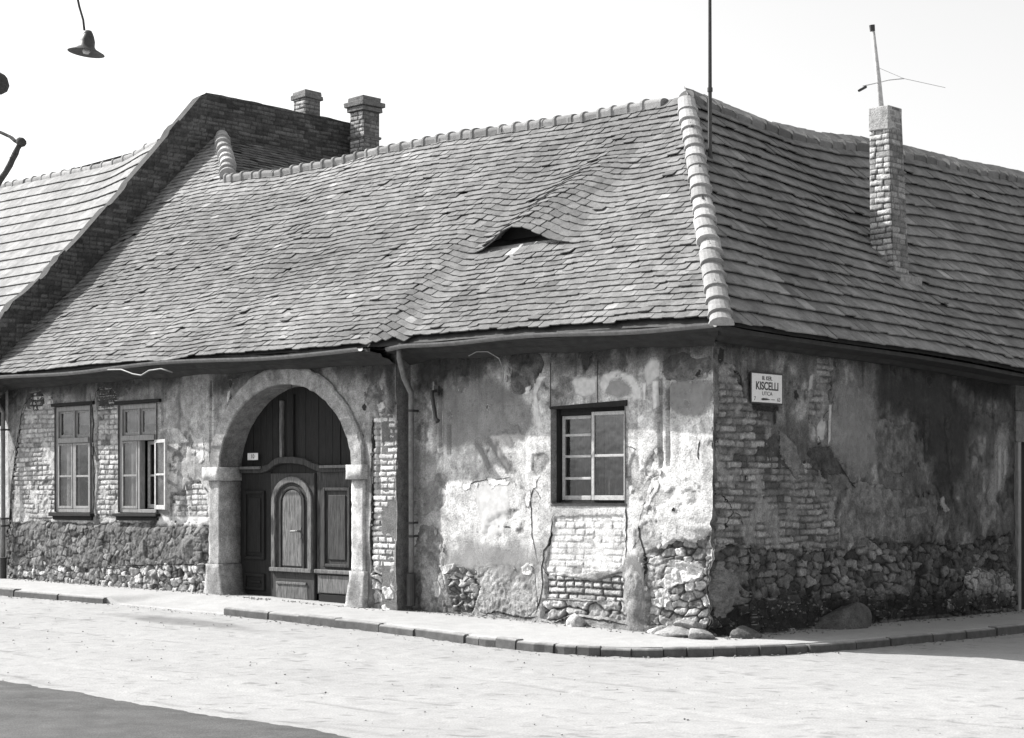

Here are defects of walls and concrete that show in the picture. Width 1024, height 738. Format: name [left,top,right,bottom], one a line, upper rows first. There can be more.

spalling [6,388,209,569]
spalling [361,381,399,568]
spalling [476,516,626,617]
crack [483,475,626,625]
peeling [654,559,705,608]
spalling [662,343,950,552]